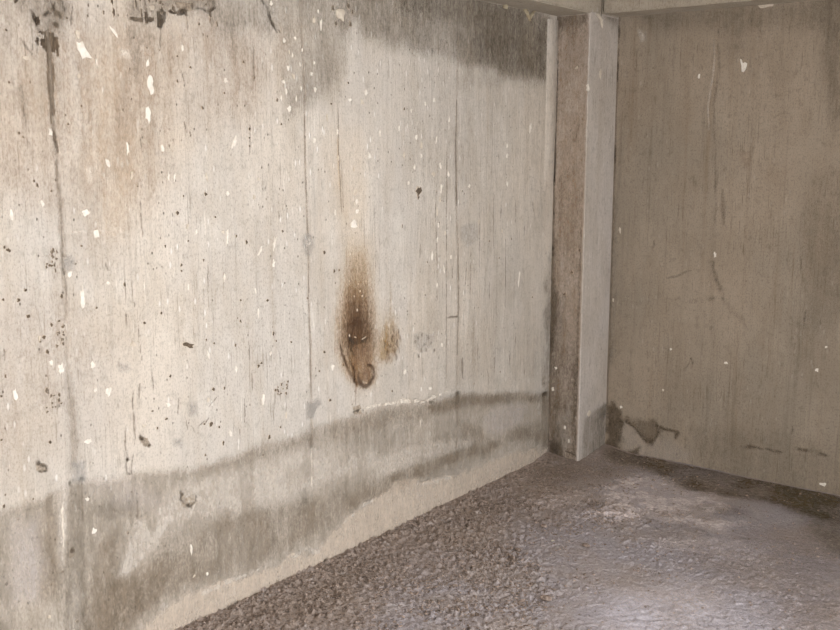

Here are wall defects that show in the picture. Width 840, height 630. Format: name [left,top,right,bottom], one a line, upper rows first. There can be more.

water stain [357,0,542,72]
water stain [0,15,587,630]
rust [340,277,374,388]
water stain [591,404,840,528]